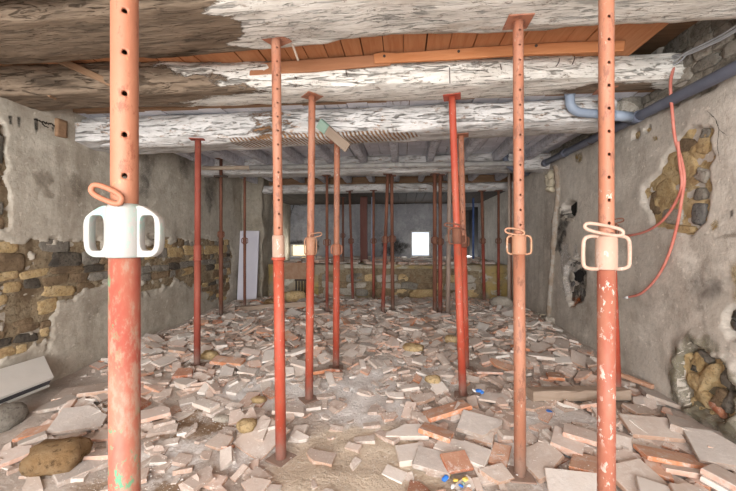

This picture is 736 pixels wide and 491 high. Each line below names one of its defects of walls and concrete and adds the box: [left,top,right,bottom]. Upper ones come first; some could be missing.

spalling [0,125,9,229]
spalling [559,202,577,222]
spalling [645,128,716,235]
spalling [0,238,108,359]
spalling [141,237,232,302]
spalling [568,261,587,304]
spalling [683,349,736,419]